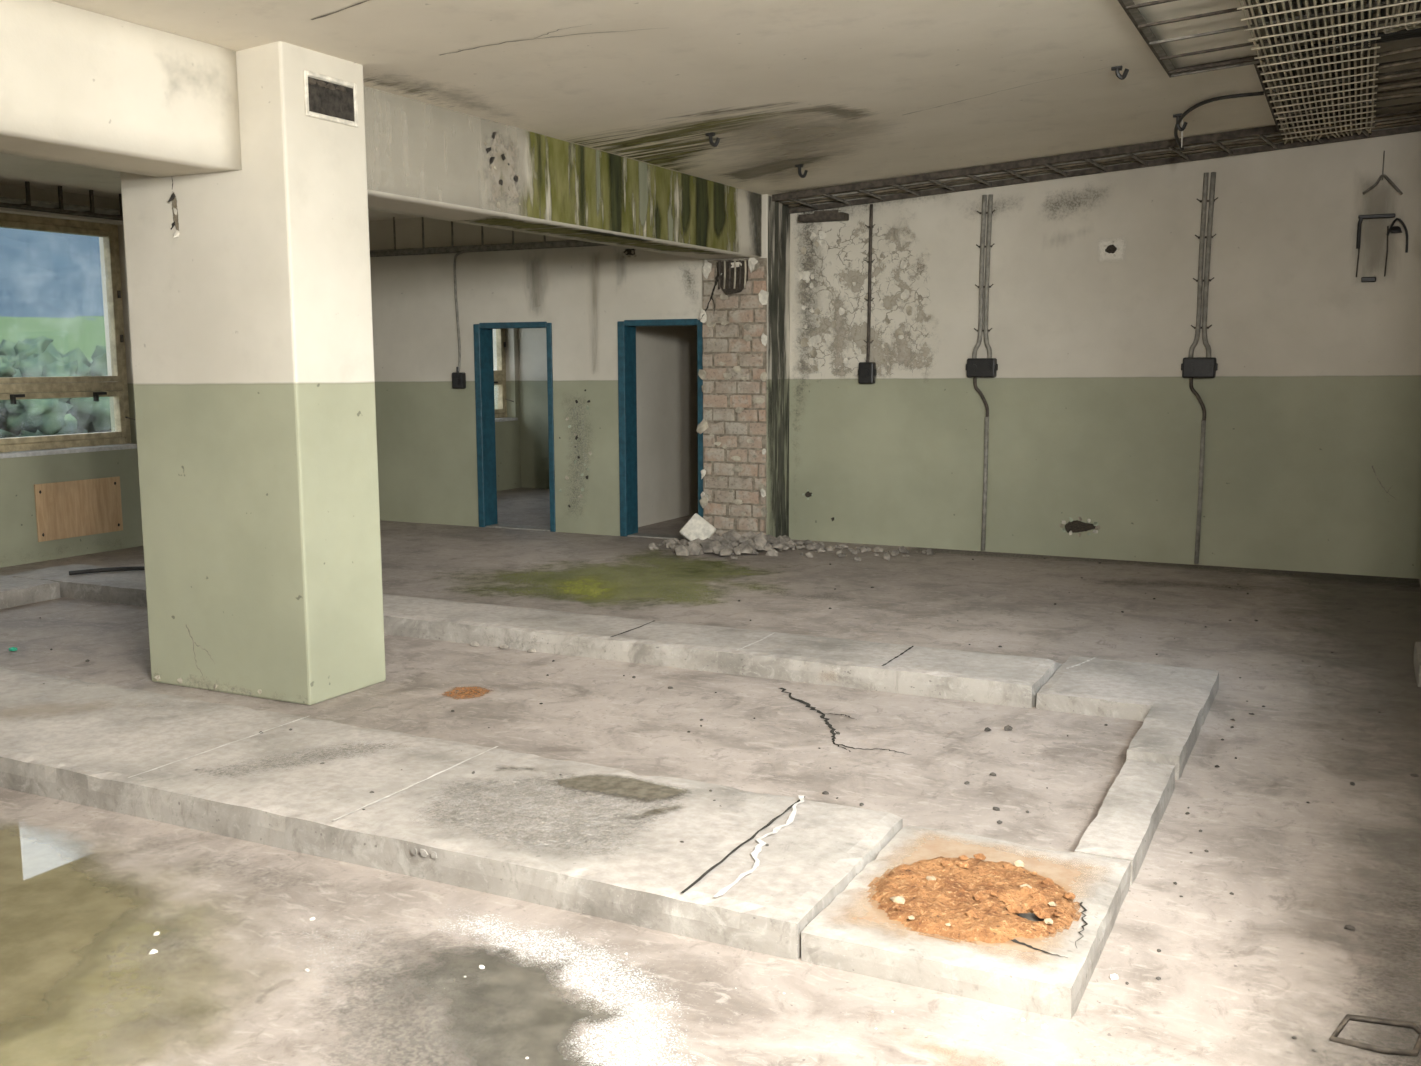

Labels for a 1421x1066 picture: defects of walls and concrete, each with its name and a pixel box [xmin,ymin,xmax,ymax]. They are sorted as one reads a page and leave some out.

crack [311,0,369,20]
damp [785,106,864,118]
peeling [795,223,932,376]
spalling [697,257,769,536]
spalling [1059,516,1100,537]
corrosion [443,686,491,699]
crack [779,688,911,755]
crack [681,795,805,897]
damp [265,905,705,1066]